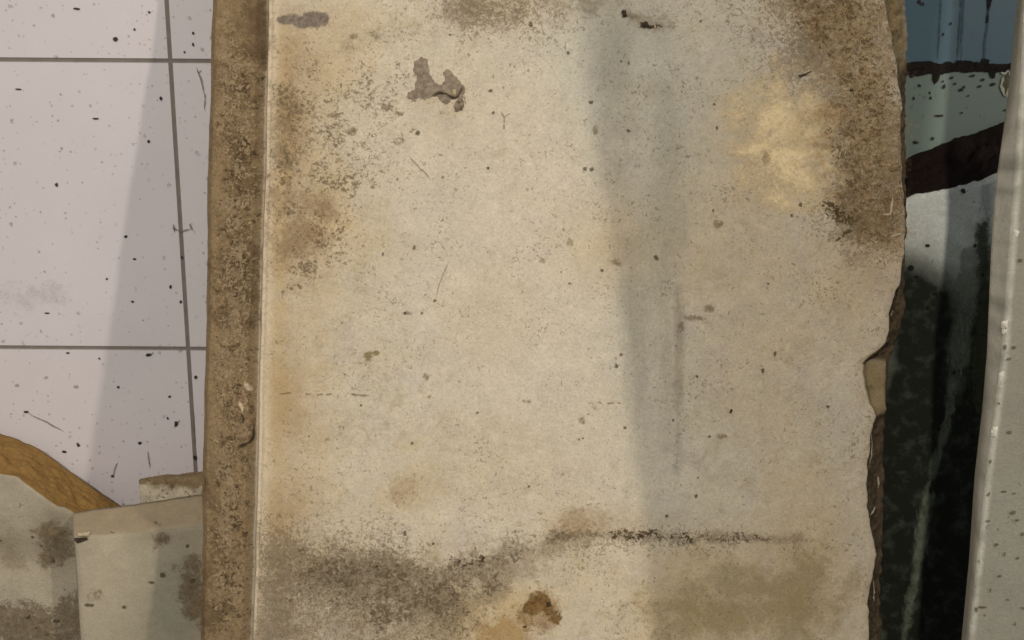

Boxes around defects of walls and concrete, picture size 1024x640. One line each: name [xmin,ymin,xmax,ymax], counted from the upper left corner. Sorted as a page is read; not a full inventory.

damp [730,0,905,264]
rust [522,591,563,628]